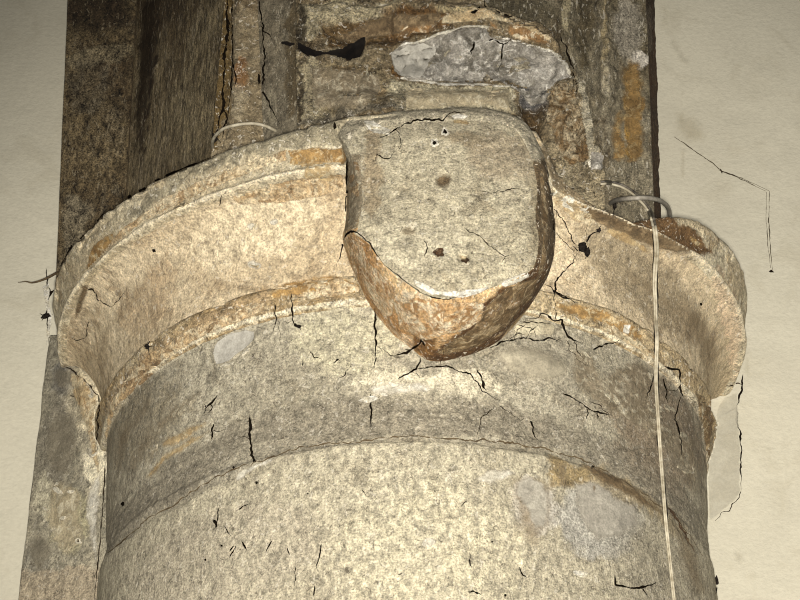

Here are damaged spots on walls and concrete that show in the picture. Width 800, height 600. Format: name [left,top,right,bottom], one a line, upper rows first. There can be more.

crack [258,1,280,124]
crack [375,111,465,160]
corrosion [611,63,645,162]
flaking render [414,280,487,298]
spalling [438,171,595,355]
crack [490,196,624,366]
crack [94,311,702,597]
flaking render [698,395,739,518]
crack [715,375,743,521]